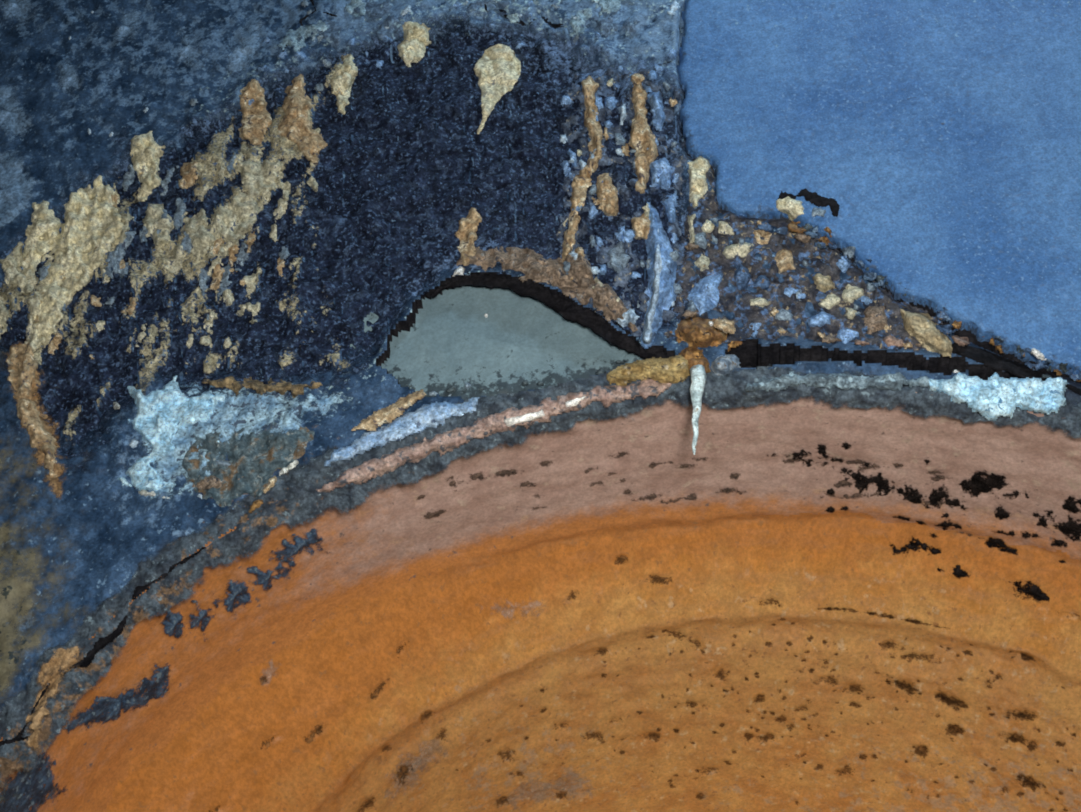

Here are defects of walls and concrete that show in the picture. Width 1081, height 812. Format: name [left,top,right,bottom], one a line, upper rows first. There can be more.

spalling [0,0,970,478]
rust [14,371,64,497]
leakage [117,375,353,499]
spalling [179,422,315,514]
leakage [767,442,1081,555]
leakage [929,370,1067,421]
crack [0,547,206,746]
leakage [937,565,969,579]
leakage [1009,580,1050,601]